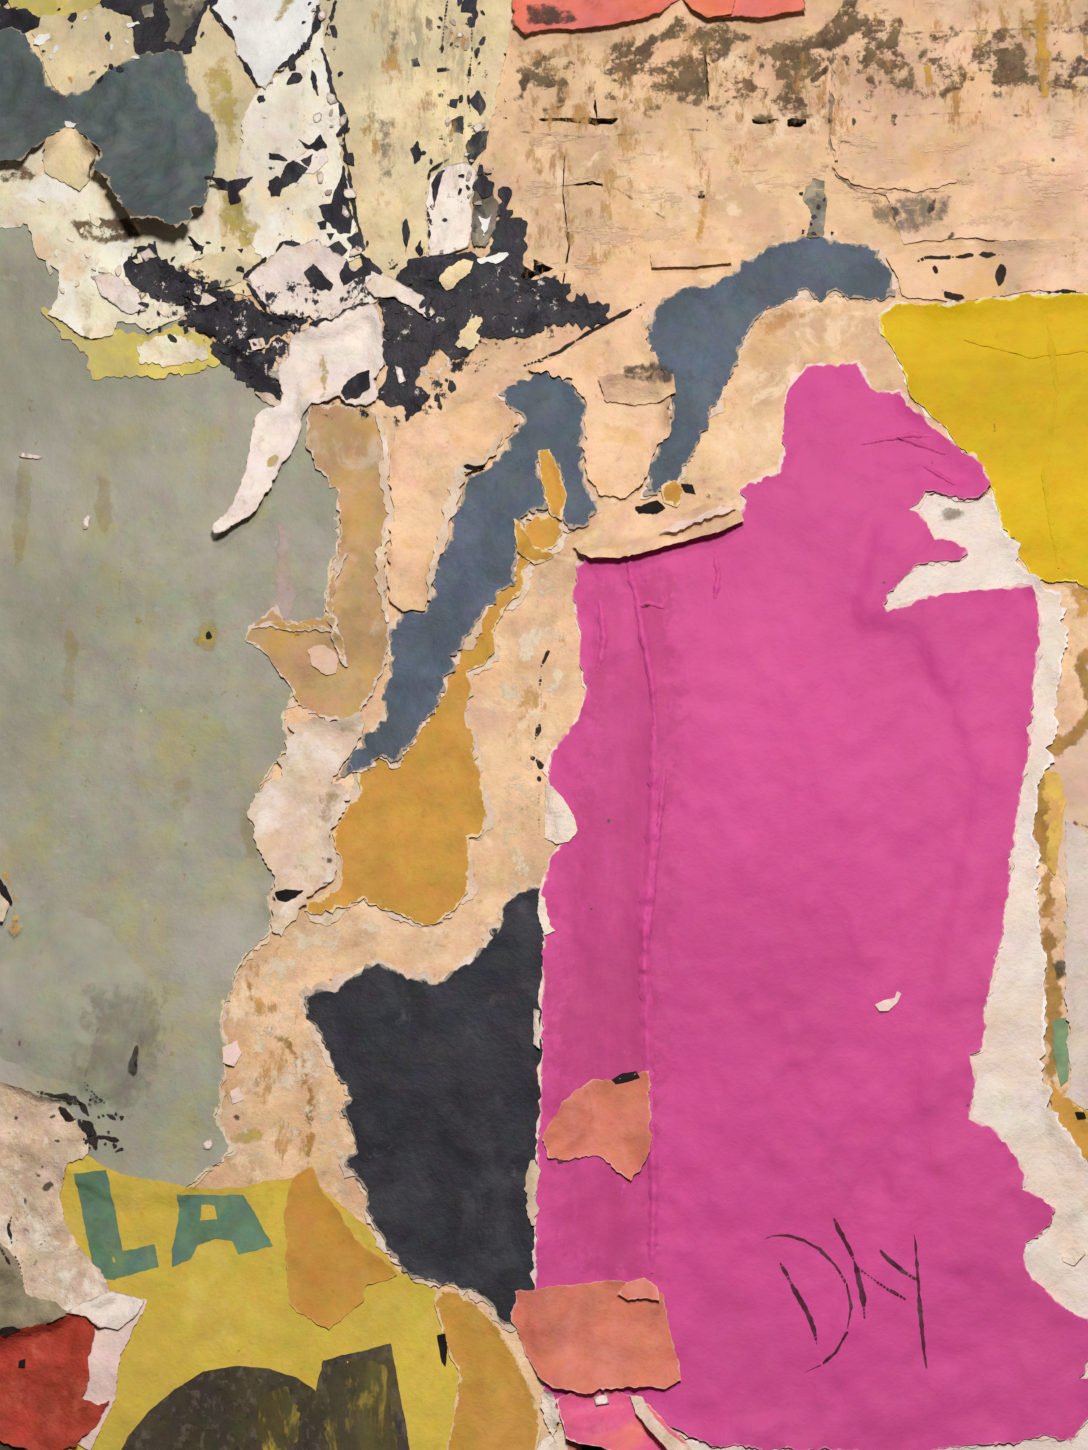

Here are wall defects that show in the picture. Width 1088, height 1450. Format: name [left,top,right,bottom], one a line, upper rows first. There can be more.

peeling [46,0,610,426]
water stain [516,0,1088,274]
peeling [875,991,901,1011]